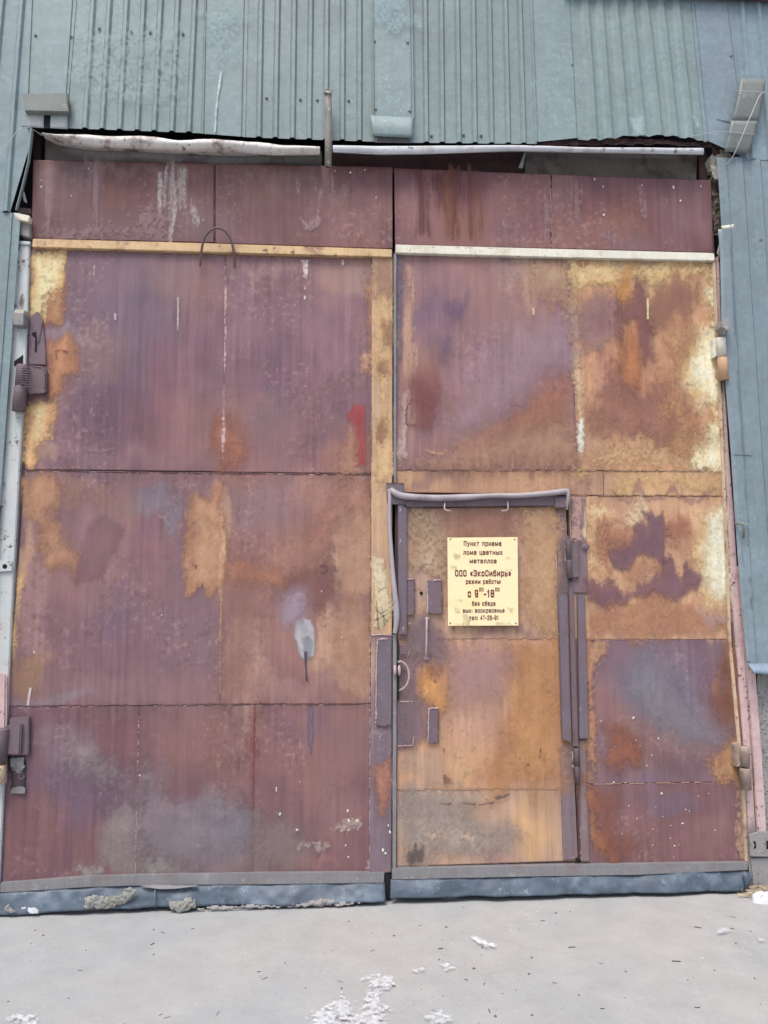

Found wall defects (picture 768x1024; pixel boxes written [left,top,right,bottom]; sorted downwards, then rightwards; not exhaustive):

rust [418,164,472,239]
rust [42,281,79,398]
rust [579,266,699,363]
rust [376,421,387,444]
rust [20,473,79,571]
rust [182,485,227,598]
rust [585,514,703,607]
rust [415,662,449,712]
rust [489,642,568,794]
rust [584,638,640,861]
rust [706,646,742,784]